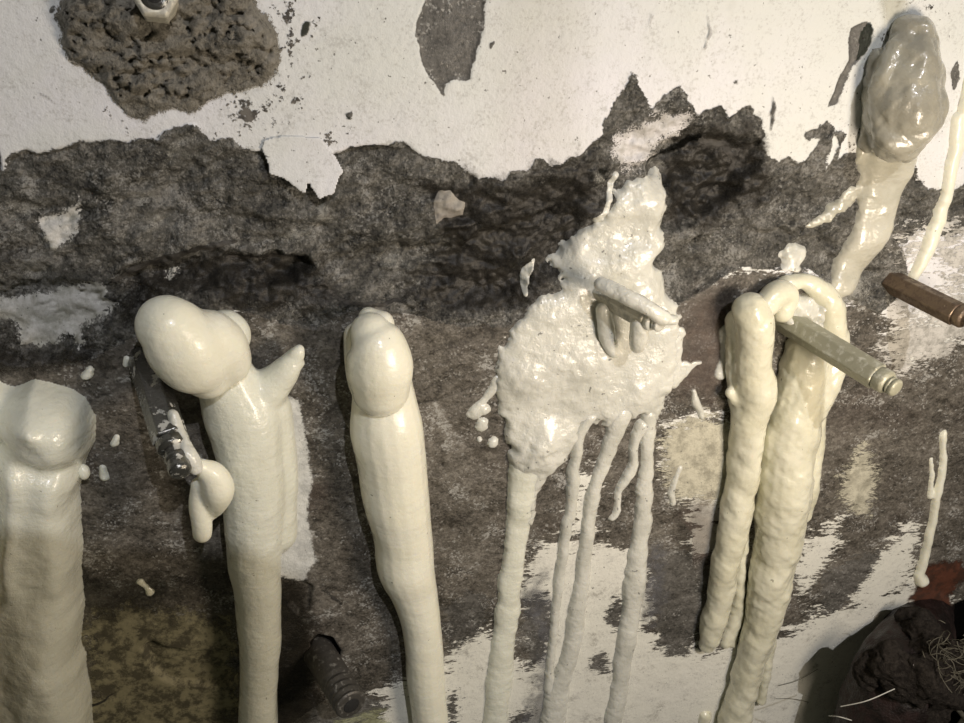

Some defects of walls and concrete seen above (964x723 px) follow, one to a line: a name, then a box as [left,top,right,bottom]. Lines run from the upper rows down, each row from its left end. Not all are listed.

peeling [221,84,286,136]
peeling [270,0,320,60]
peeling [415,0,495,96]
peeling [951,61,960,90]
peeling [772,327,788,376]
peeling [173,389,216,461]
peeling [777,165,964,639]
peeling [592,414,641,556]
peeling [514,420,606,683]
peeling [737,517,755,645]
rust [908,560,964,606]
peeling [440,609,452,630]